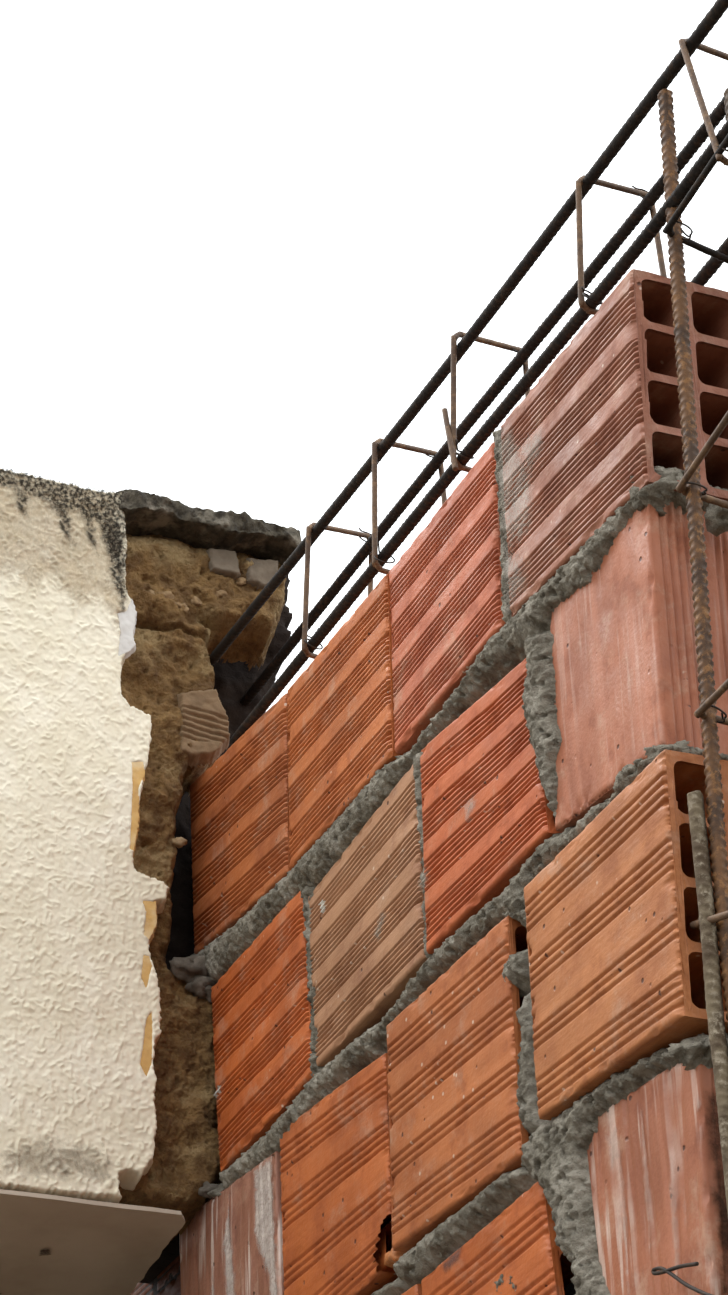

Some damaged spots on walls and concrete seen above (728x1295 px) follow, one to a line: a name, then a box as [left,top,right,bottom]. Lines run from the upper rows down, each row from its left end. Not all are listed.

spalling [686,0,728,58]
flaking render [117,49,728,1241]
leakage [212,1211,233,1295]
leakage [254,1162,277,1295]
spalling [384,1248,407,1269]